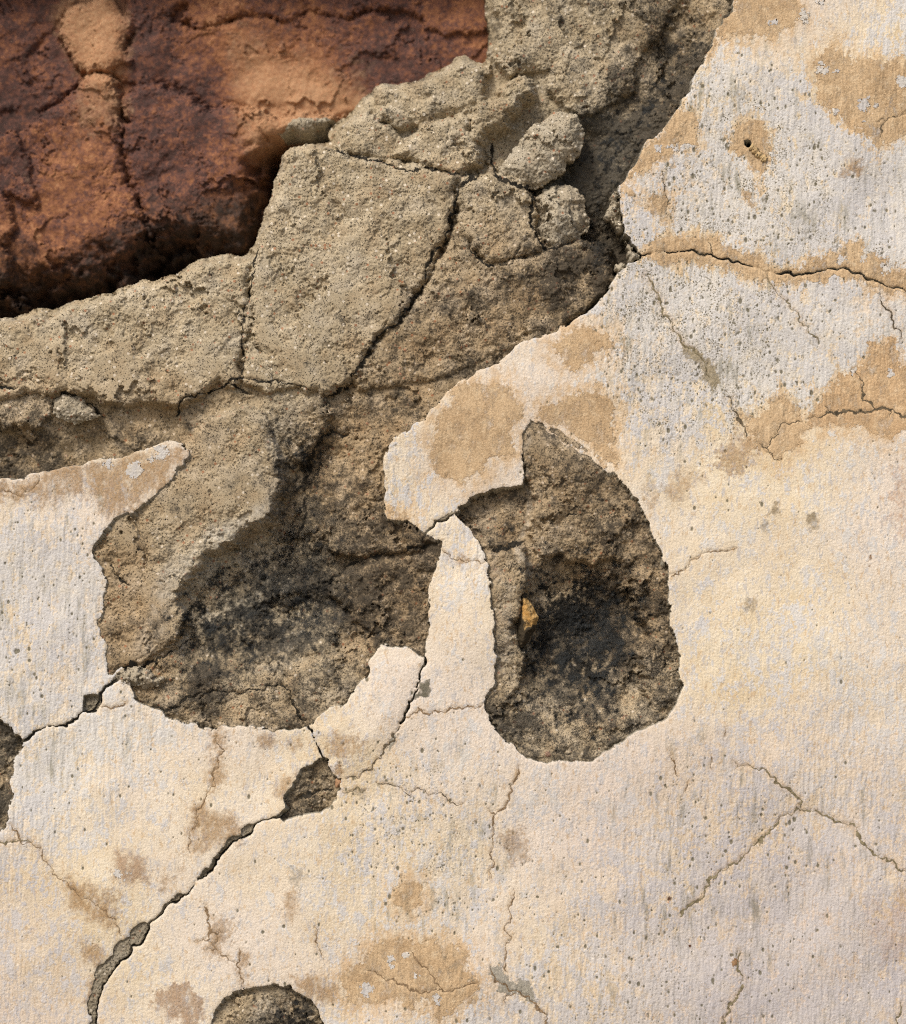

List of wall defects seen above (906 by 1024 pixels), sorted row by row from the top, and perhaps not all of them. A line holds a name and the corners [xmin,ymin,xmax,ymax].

peeling [622,109,699,196]
crack [175,143,582,417]
crack [640,243,906,460]
crack [21,639,192,743]
crack [0,657,481,1024]
spalling [93,407,442,732]
water stain [162,430,376,701]
spalling [281,759,341,820]
spalling [430,380,683,763]
water stain [508,549,661,724]
crack [679,757,905,917]
spalling [213,985,324,1024]